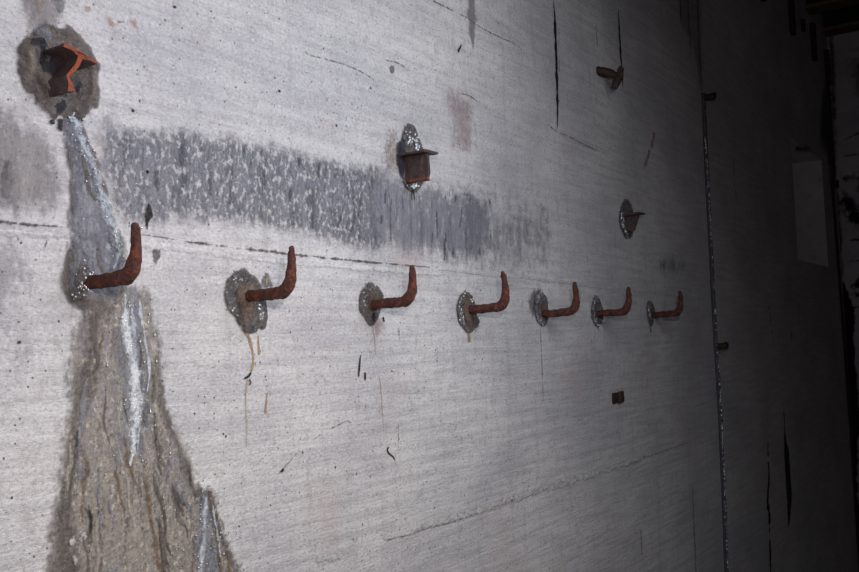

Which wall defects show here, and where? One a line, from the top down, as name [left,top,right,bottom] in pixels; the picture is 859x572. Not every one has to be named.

water stain [24,0,65,28]
spalling [18,23,101,131]
crack [550,7,606,154]
crack [616,10,624,85]
spalling [397,123,424,200]
rust [244,332,261,429]
water stain [47,112,498,572]